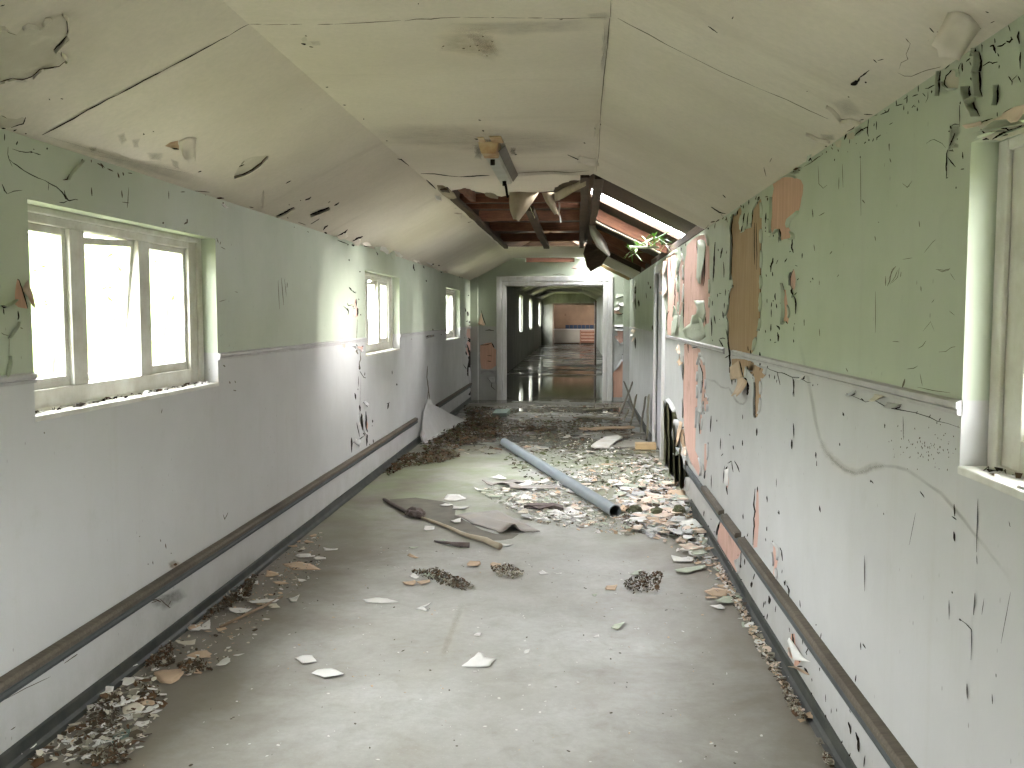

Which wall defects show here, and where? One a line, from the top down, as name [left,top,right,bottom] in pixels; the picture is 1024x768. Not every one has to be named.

peeling [0,13,70,85]
peeling [962,104,1024,141]
peeling [166,137,201,172]
peeling [234,156,269,179]
peeling [15,279,36,309]
peeling [610,144,839,573]
peeling [845,391,960,428]
crack [710,415,757,485]
crack [952,505,978,559]
crack [952,592,1011,651]